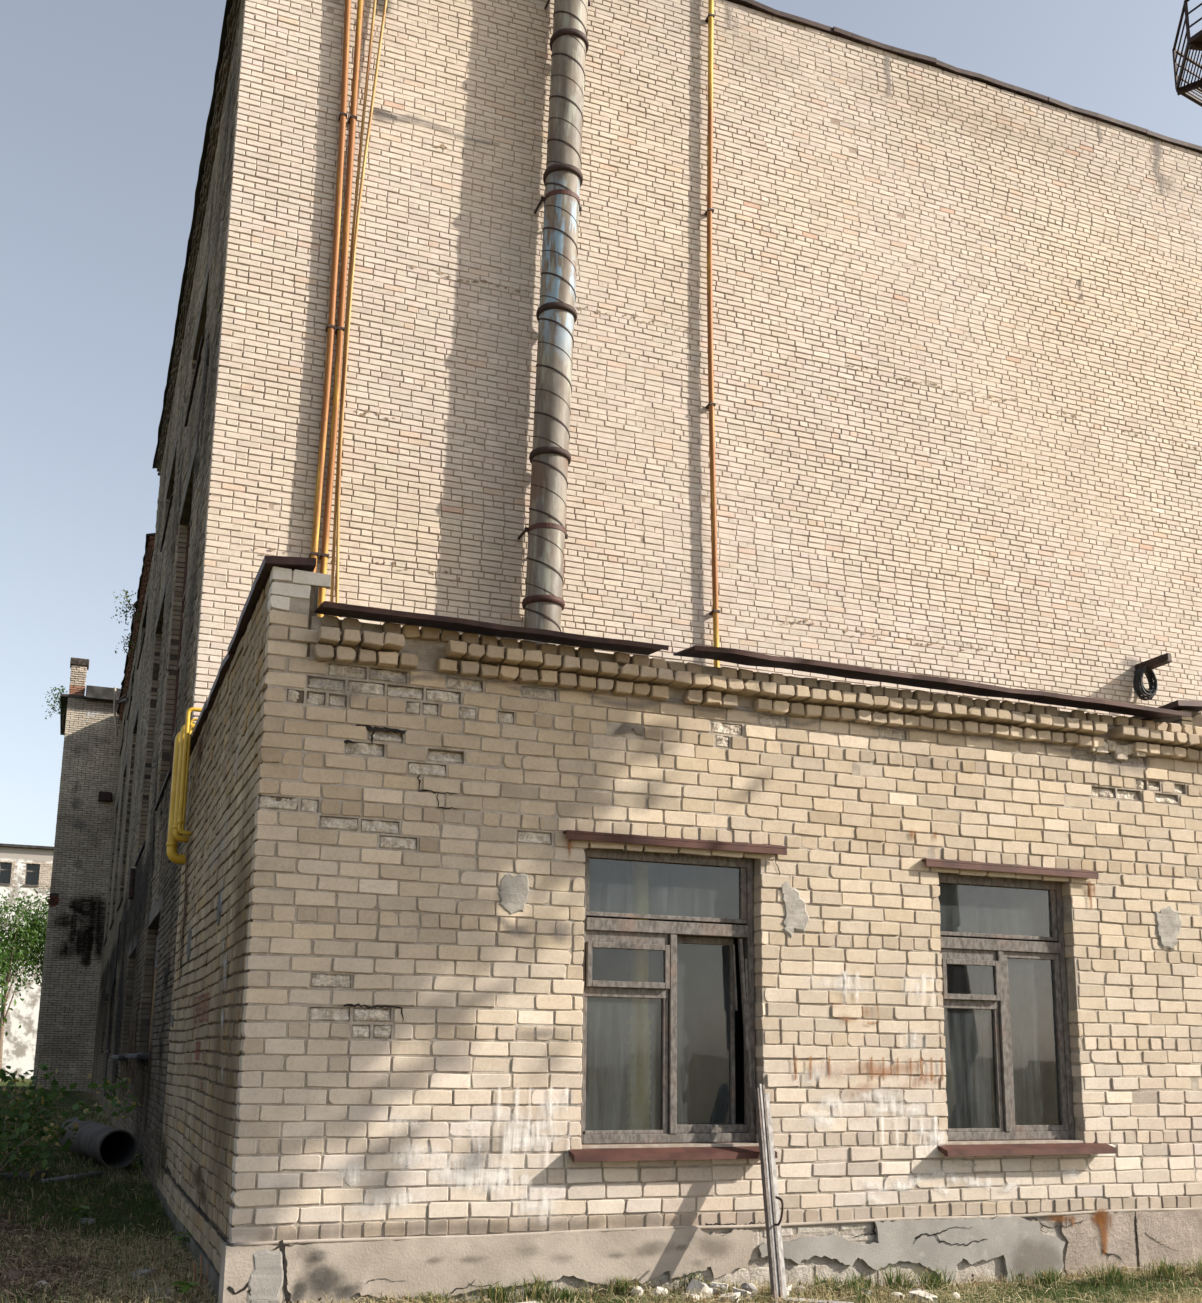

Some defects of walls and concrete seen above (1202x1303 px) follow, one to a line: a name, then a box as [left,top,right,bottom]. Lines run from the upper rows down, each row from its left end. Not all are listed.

spalling [256,795,416,850]
spalling [309,1007,391,1039]
crack [914,1226,988,1246]
crack [1024,1217,1085,1232]
rust [1093,1210,1111,1254]
crack [1102,1216,1179,1260]